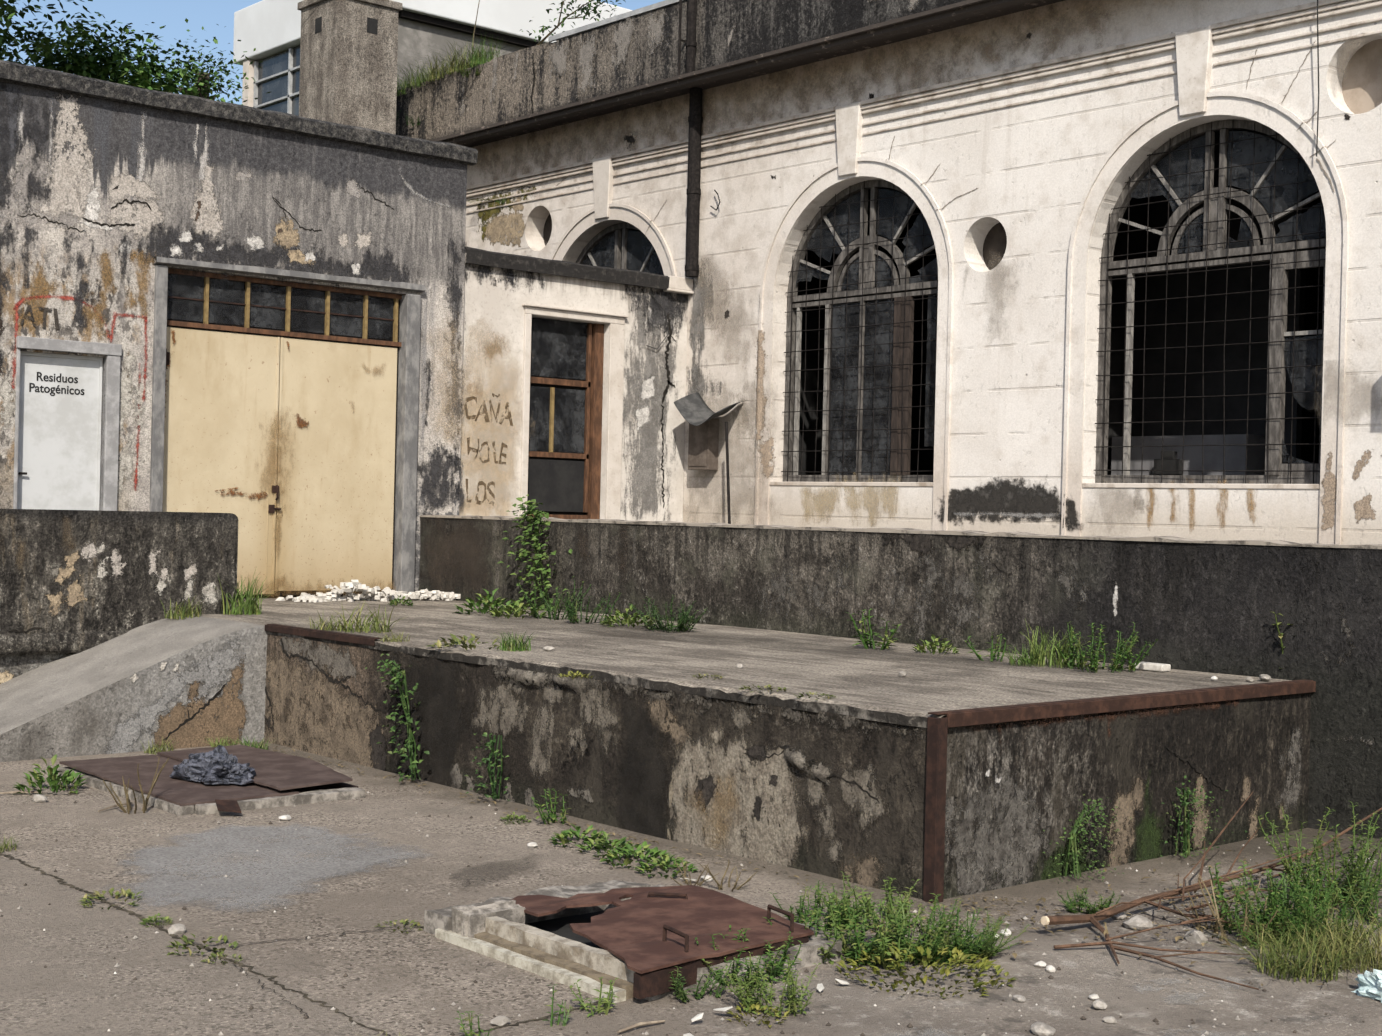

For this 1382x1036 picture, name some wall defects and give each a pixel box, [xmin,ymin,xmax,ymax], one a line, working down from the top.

damp [0,84,56,389]
damp [63,230,101,329]
damp [115,222,409,291]
spalling [244,217,315,265]
damp [417,55,879,593]
damp [934,477,1081,531]
spalling [44,542,126,616]
peeling [148,549,218,604]
crack [264,639,386,733]
spalling [264,636,388,771]
spalling [470,665,927,889]
crack [223,926,424,1016]